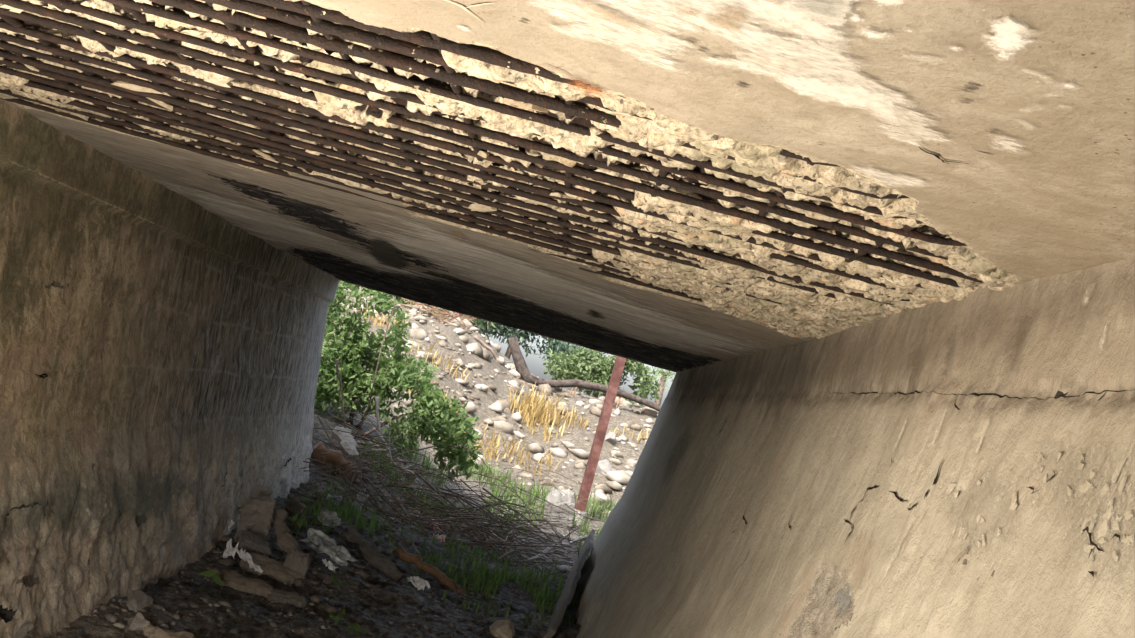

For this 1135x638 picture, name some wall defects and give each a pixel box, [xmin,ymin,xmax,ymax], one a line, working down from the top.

water stain [530,0,949,146]
water stain [985,18,1032,58]
spalling [0,0,1024,339]
crack [918,146,968,164]
water stain [995,136,1021,151]
water stain [0,115,813,403]
spalling [281,243,724,373]
crack [820,390,1128,410]
crack [844,459,944,542]
crack [1080,526,1120,577]